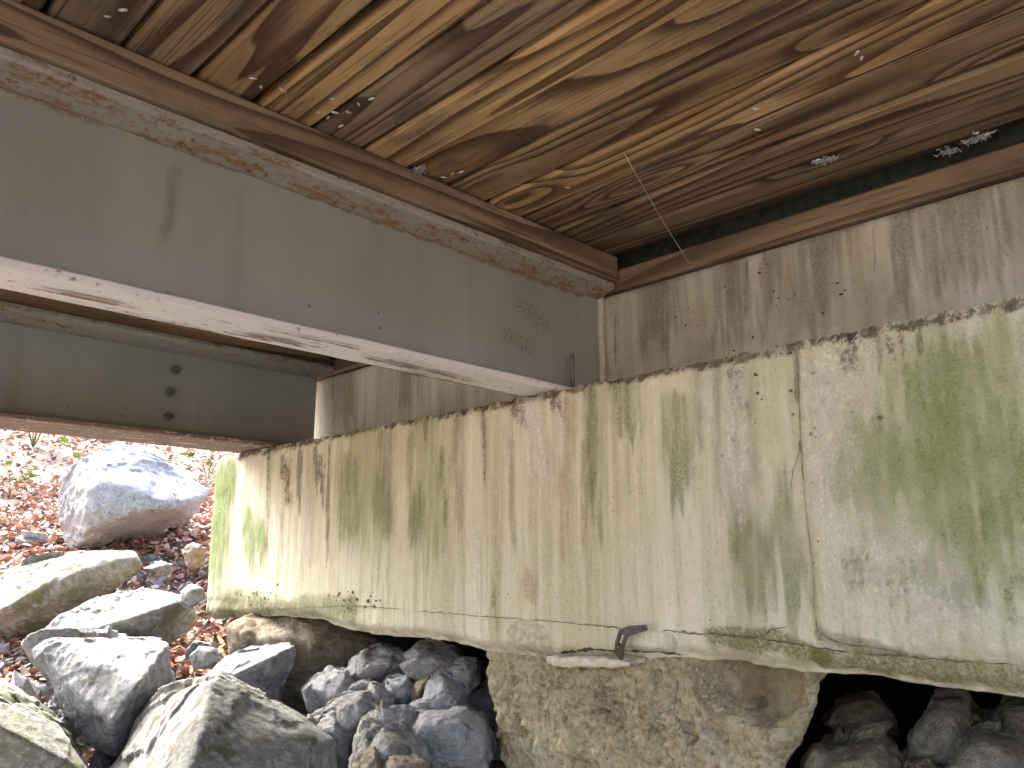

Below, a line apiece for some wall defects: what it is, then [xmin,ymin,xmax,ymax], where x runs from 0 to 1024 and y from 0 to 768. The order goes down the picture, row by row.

damp [208,459,235,590]
damp [242,456,283,571]
damp [297,447,329,560]
crack [790,350,814,592]
damp [795,331,995,644]